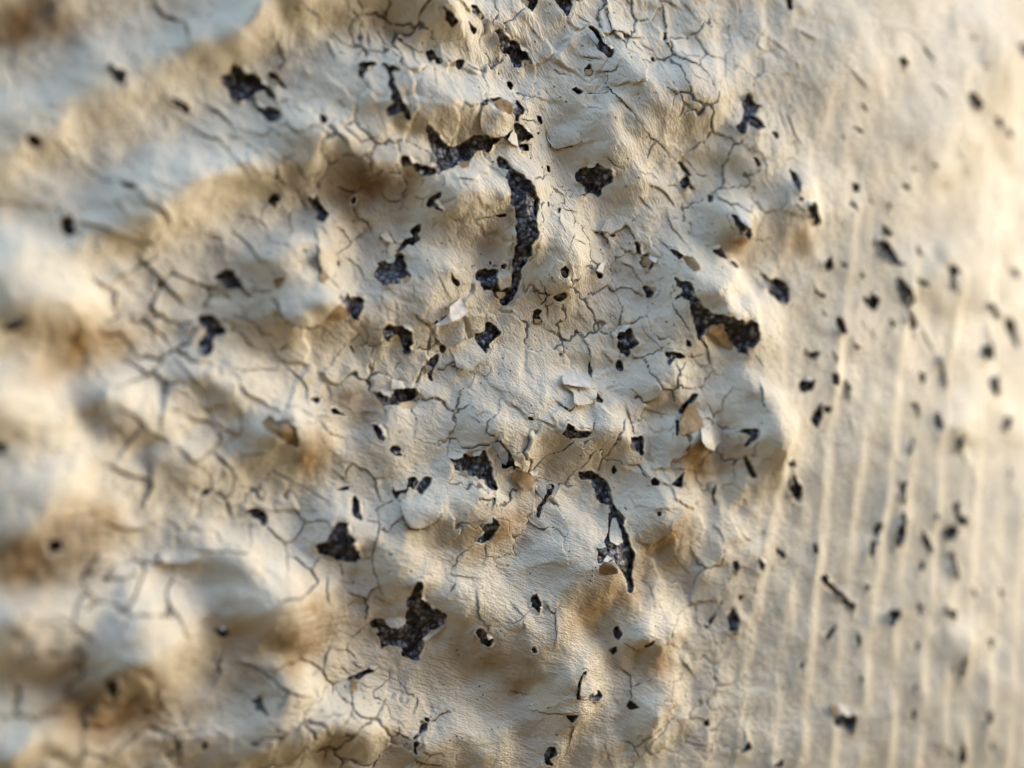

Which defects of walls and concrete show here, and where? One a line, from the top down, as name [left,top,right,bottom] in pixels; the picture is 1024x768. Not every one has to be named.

spalling [216,57,291,128]
crack [199,73,493,369]
spalling [350,0,585,460]
crack [578,56,682,246]
crack [578,0,700,117]
spalling [601,212,762,374]
crack [95,288,337,531]
crack [217,464,445,766]
spalling [311,482,367,567]
spalling [339,578,451,690]
crack [450,545,557,637]
spalling [575,462,637,597]